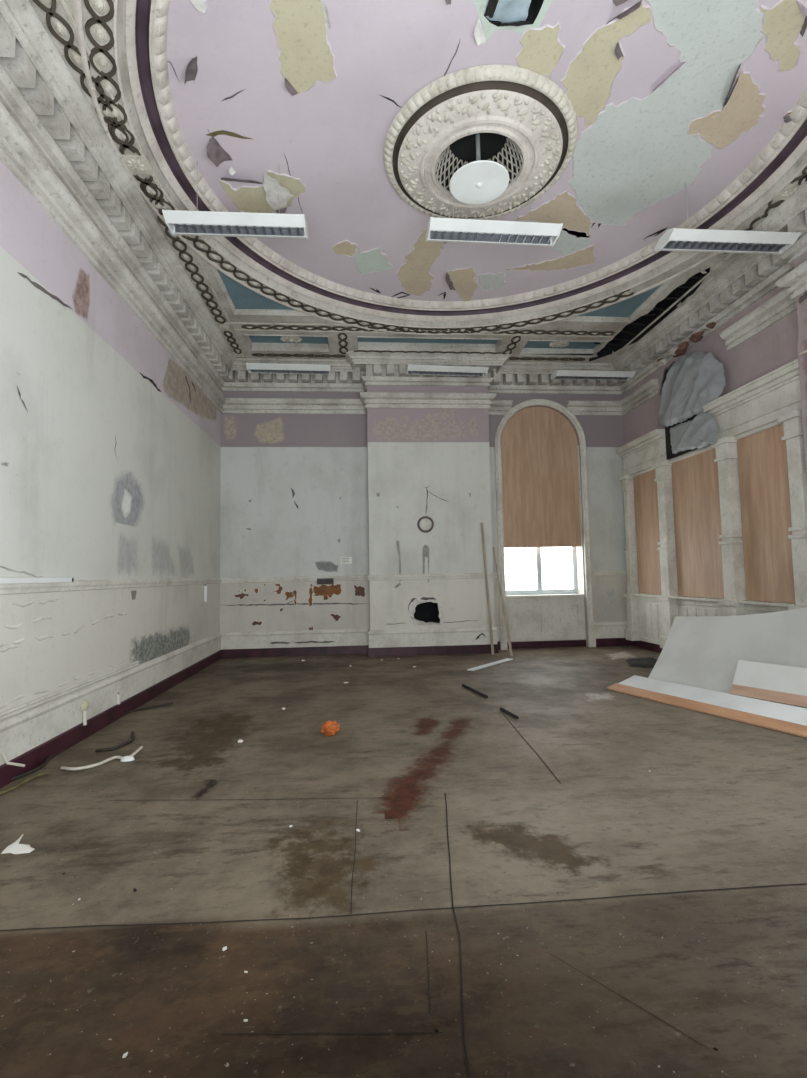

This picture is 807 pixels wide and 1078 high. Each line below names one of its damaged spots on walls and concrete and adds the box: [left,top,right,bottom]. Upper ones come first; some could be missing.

peeling [268,0,338,96]
peeling [207,137,306,214]
peeling [473,0,807,272]
peeling [331,228,478,301]
peeling [797,291,807,472]
peeling [233,583,366,612]
spalling [408,597,442,625]
damp [221,714,635,947]